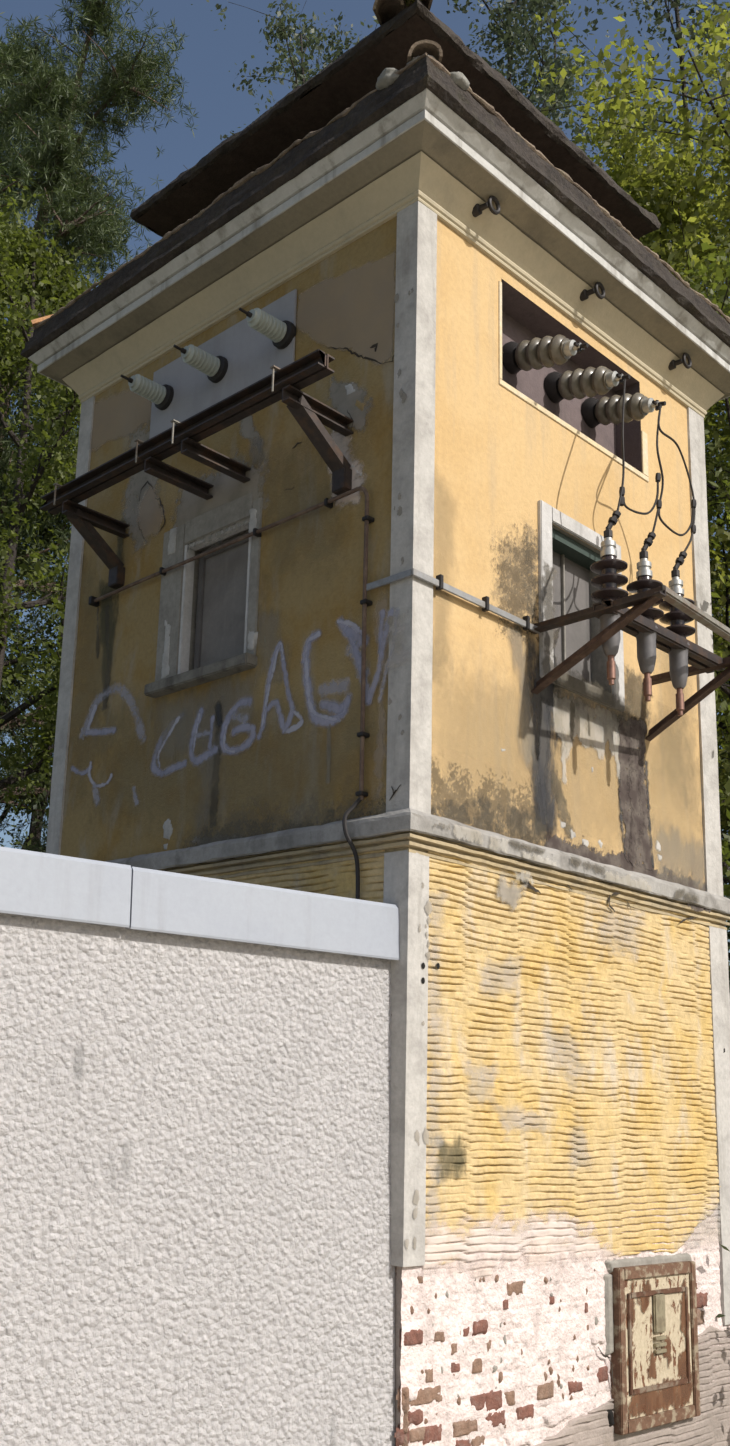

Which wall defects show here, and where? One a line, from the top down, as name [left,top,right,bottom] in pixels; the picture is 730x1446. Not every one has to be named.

water stain [511,628,654,872]
peeling [553,695,620,783]
peeling [415,1127,465,1182]
spalling [394,1190,730,1446]